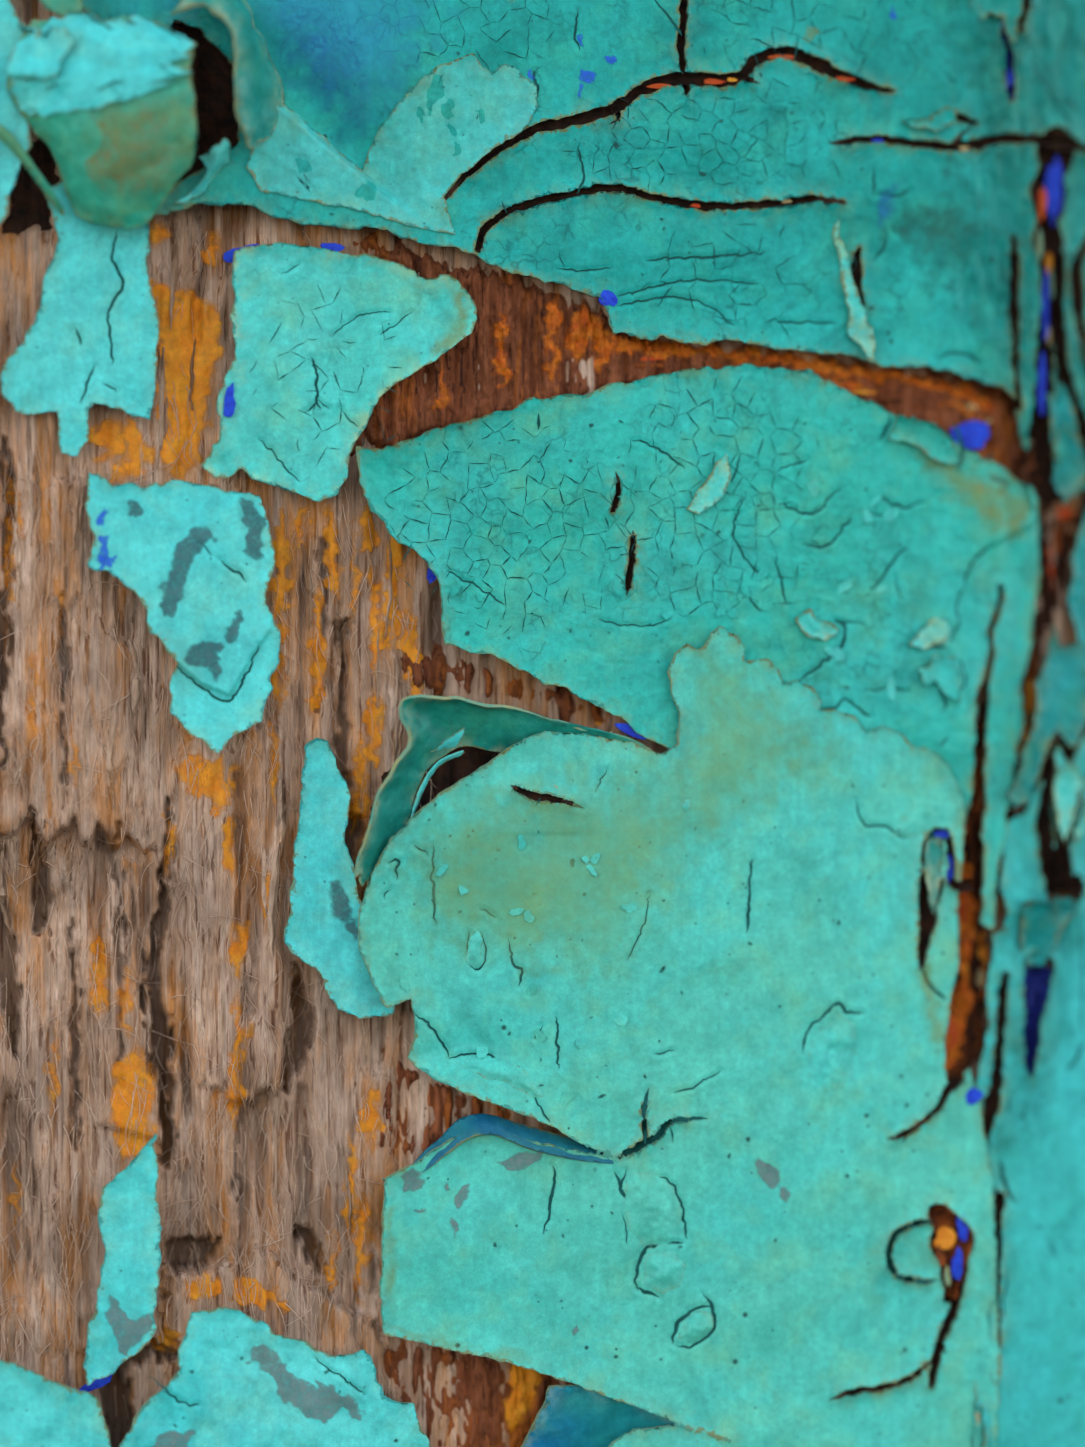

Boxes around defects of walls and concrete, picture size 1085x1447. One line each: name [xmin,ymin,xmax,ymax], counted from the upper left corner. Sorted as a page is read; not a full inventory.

crack [313,0,1085,508]
peeling [85,213,1085,842]
crack [250,263,991,747]
peeling [0,1134,675,1447]
peeling [284,641,658,1019]
peeling [379,1061,621,1178]
crack [543,1167,556,1234]
crack [628,897,649,958]
crack [745,859,753,931]
crack [802,1002,863,1053]
crack [829,760,1084,1401]
peeling [918,702,1002,1105]